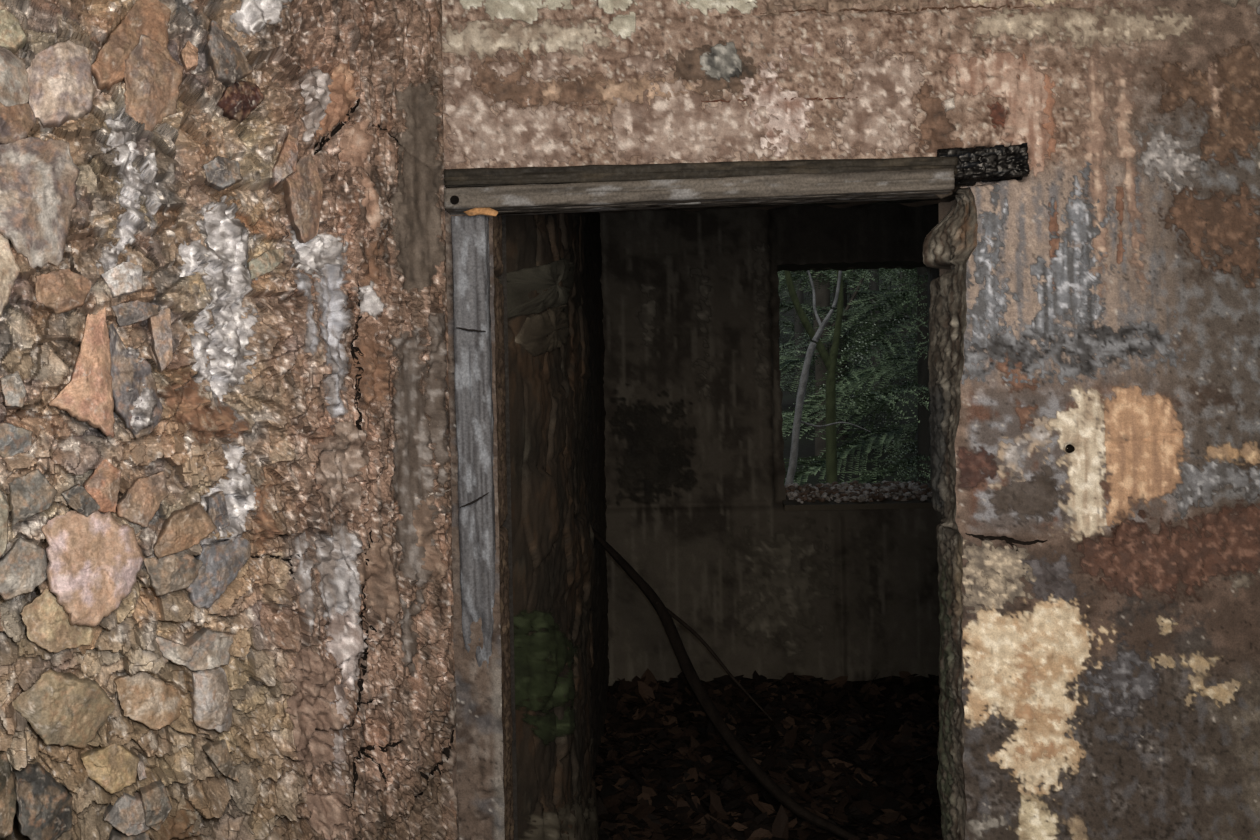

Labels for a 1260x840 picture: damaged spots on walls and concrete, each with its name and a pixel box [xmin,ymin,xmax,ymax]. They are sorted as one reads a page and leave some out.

efflorescence [230,0,292,38]
peeling [460,0,573,24]
peeling [595,0,637,39]
peeling [677,0,758,15]
efflorescence [300,67,333,142]
efflorescence [96,108,162,273]
peeling [314,36,1060,293]
efflorescence [178,195,259,402]
efflorescence [288,228,386,429]
crack [965,533,1048,551]
efflorescence [292,516,369,791]